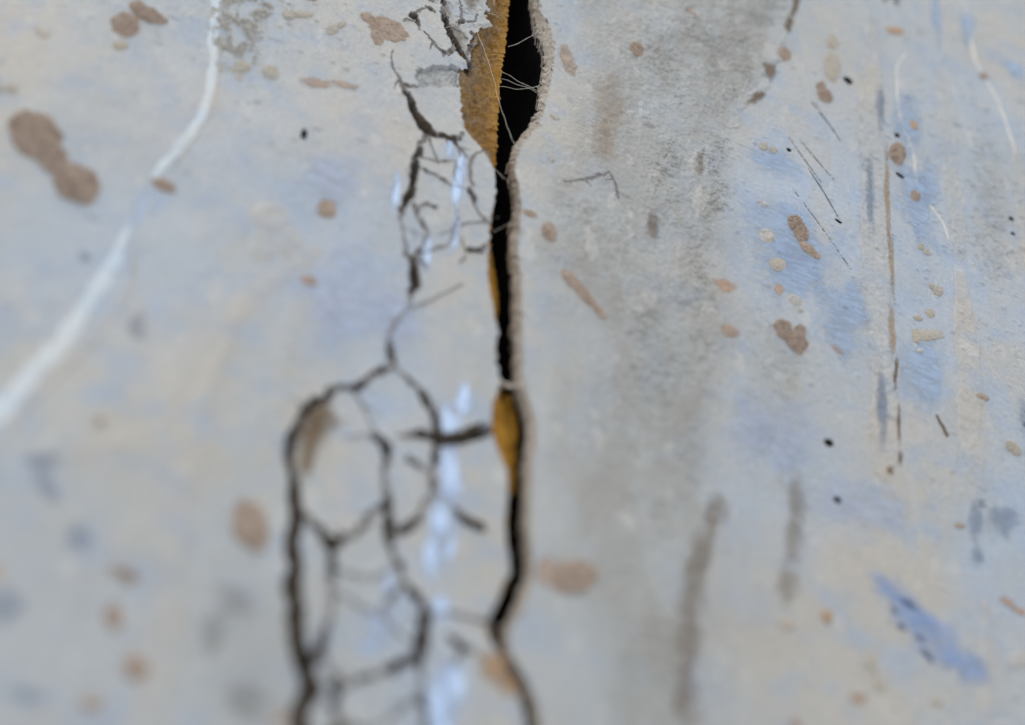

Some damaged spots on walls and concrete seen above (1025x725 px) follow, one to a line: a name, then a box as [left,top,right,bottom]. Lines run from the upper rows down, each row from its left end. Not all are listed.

crack [277,0,556,725]